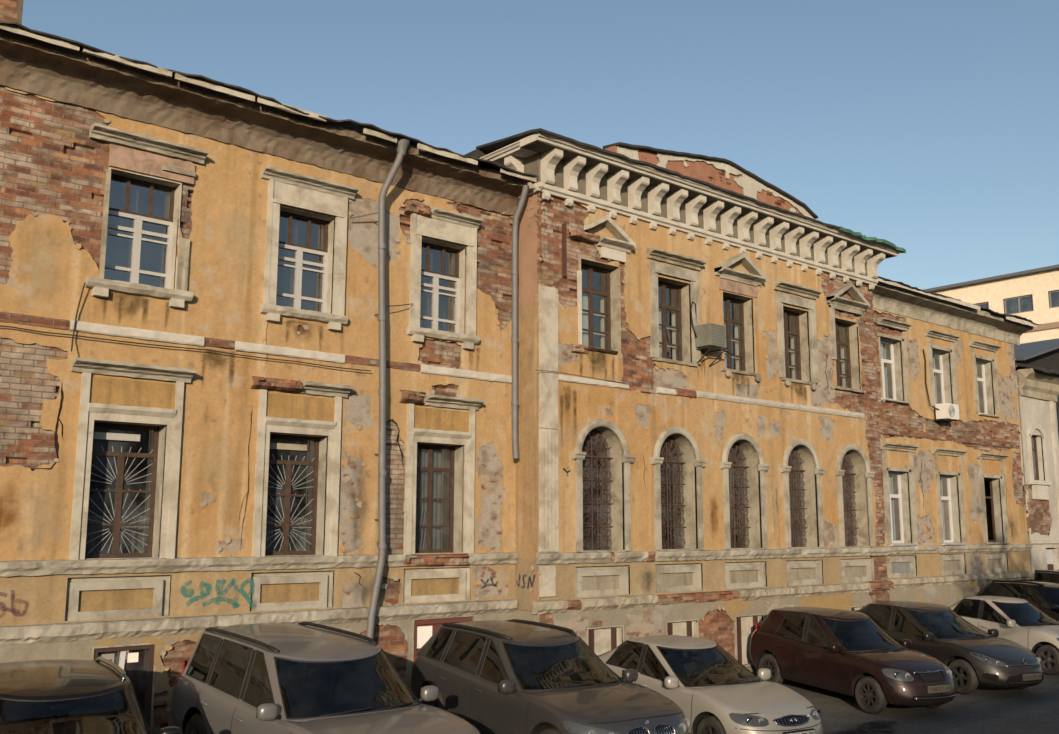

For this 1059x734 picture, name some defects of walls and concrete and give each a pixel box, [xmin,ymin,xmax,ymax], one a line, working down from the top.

flaking render [0,87,110,285]
flaking render [447,202,513,331]
flaking render [527,182,687,430]
flaking render [0,338,68,471]
peeling [345,393,372,430]
flaking render [338,420,405,555]
flaking render [810,272,1052,603]
flaking render [326,622,408,680]
flaking render [695,606,735,658]